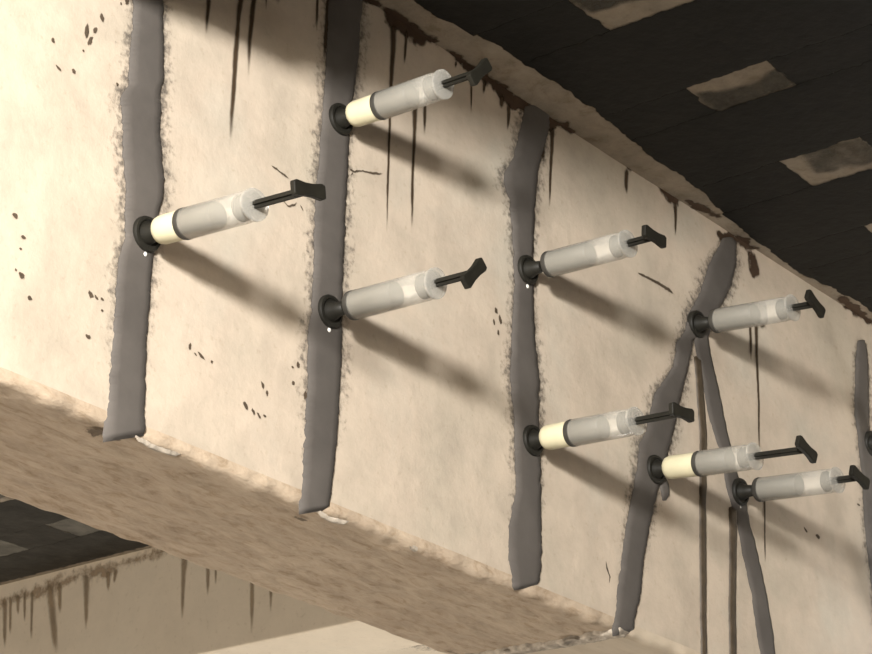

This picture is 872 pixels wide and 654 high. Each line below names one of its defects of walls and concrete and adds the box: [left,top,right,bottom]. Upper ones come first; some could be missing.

corrosion [230,0,267,125]
corrosion [316,0,329,53]
corrosion [362,0,439,87]
corrosion [448,50,475,72]
corrosion [481,73,530,126]
corrosion [411,87,426,215]
corrosion [542,117,575,198]
corrosion [659,188,721,232]
corrosion [717,231,760,278]
corrosion [837,296,872,324]
corrosion [749,306,768,445]
water stain [3,564,117,643]